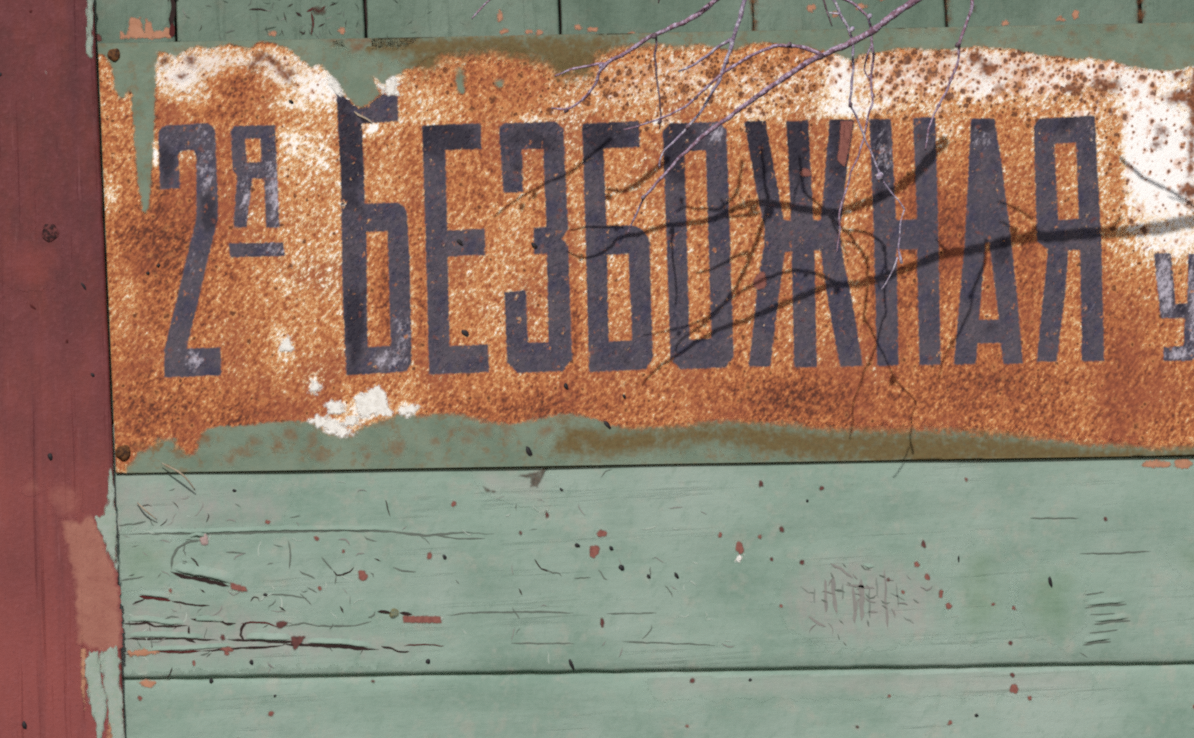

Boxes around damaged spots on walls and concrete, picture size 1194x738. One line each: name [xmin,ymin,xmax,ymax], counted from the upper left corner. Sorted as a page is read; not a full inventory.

peeling [86,0,102,58]
peeling [120,17,171,40]
rust [157,51,201,82]
rust [245,48,298,90]
rust [317,33,635,91]
rust [940,48,1006,95]
rust [1062,74,1125,101]
rust [1147,67,1194,203]
rust [169,423,331,469]
rust [357,414,408,466]
rust [534,413,1194,465]
peeling [21,469,441,738]